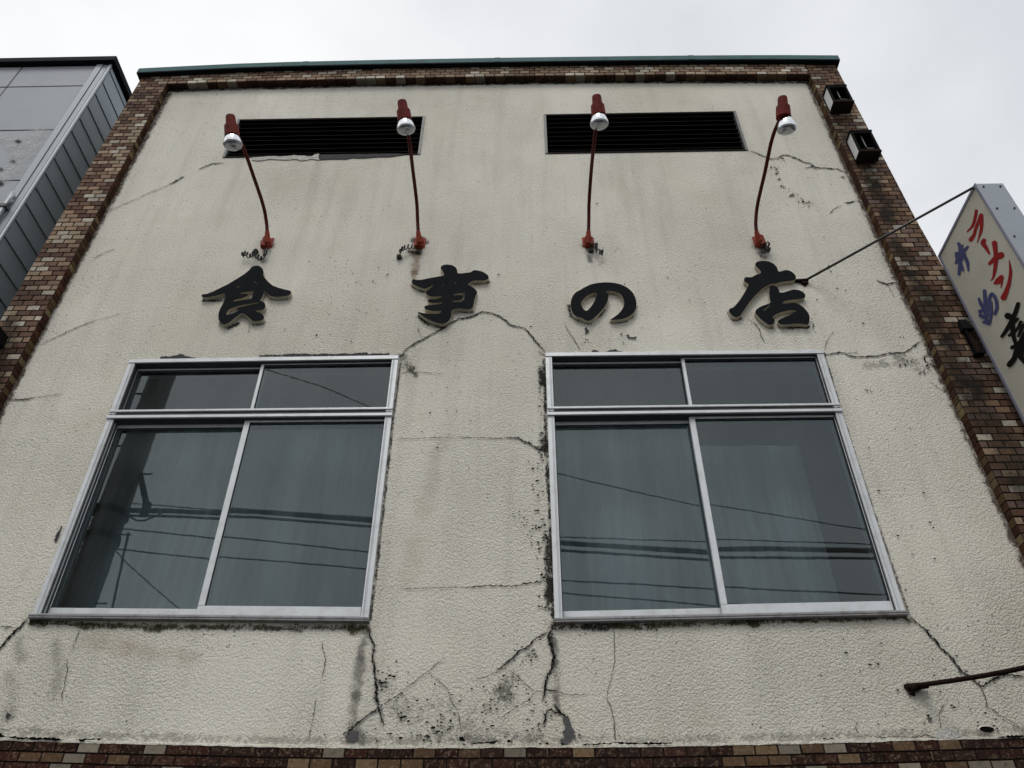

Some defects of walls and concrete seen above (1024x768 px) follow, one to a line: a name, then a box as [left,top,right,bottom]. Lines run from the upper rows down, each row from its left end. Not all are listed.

crack [755,152,847,177]
crack [399,311,546,374]
crack [812,322,942,390]
crack [398,436,545,451]
water stain [26,354,417,745]
water stain [537,359,914,670]
crack [343,629,461,735]
crack [477,626,616,739]
crack [913,619,1023,730]